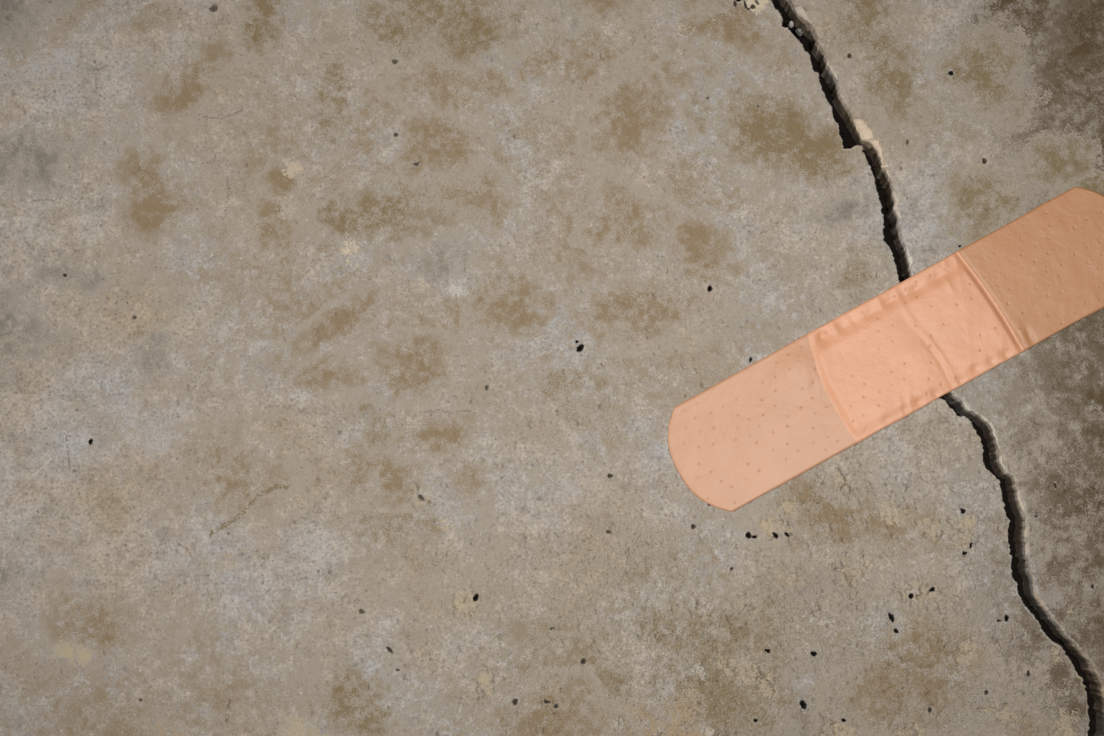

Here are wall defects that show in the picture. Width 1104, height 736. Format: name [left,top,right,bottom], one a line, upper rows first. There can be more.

crack [771,0,904,283]
crack [939,396,1096,736]